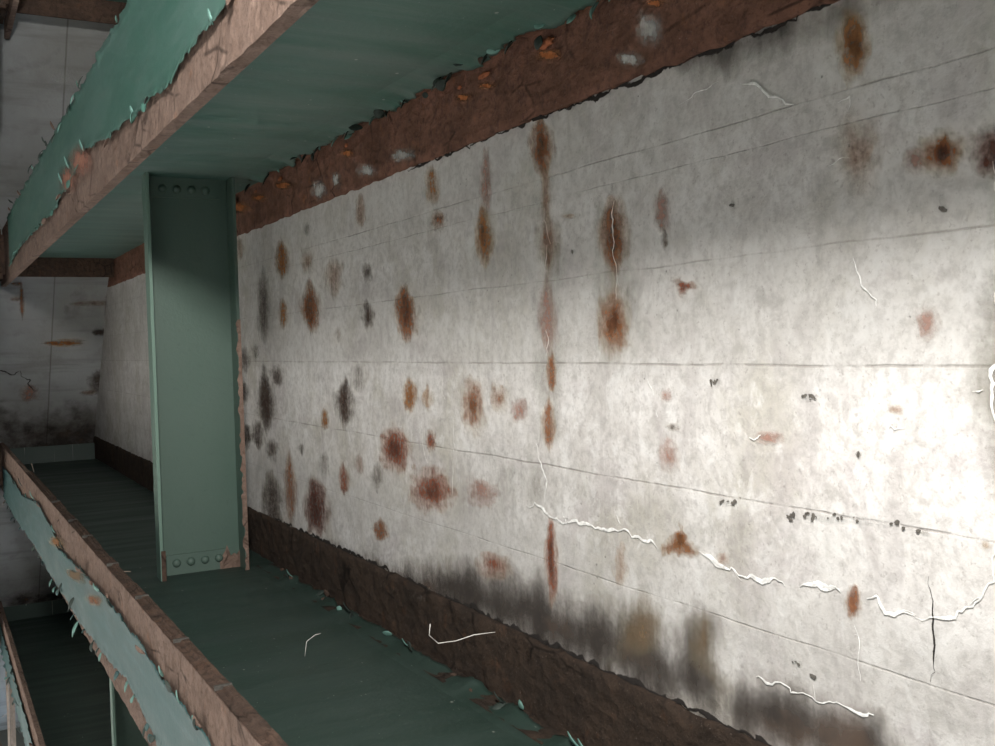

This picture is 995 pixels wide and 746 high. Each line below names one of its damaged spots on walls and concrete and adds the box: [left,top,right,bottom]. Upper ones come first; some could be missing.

peeling [7,0,231,266]
peeling [235,0,610,193]
crack [409,4,831,171]
corrosion [396,288,415,339]
peeling [0,467,211,746]
corrosion [305,479,328,535]
corrosion [381,430,407,470]
crack [275,518,771,746]
corrosion [546,522,557,598]
water stain [405,567,716,708]
water stain [732,690,883,746]
crack [756,675,874,717]